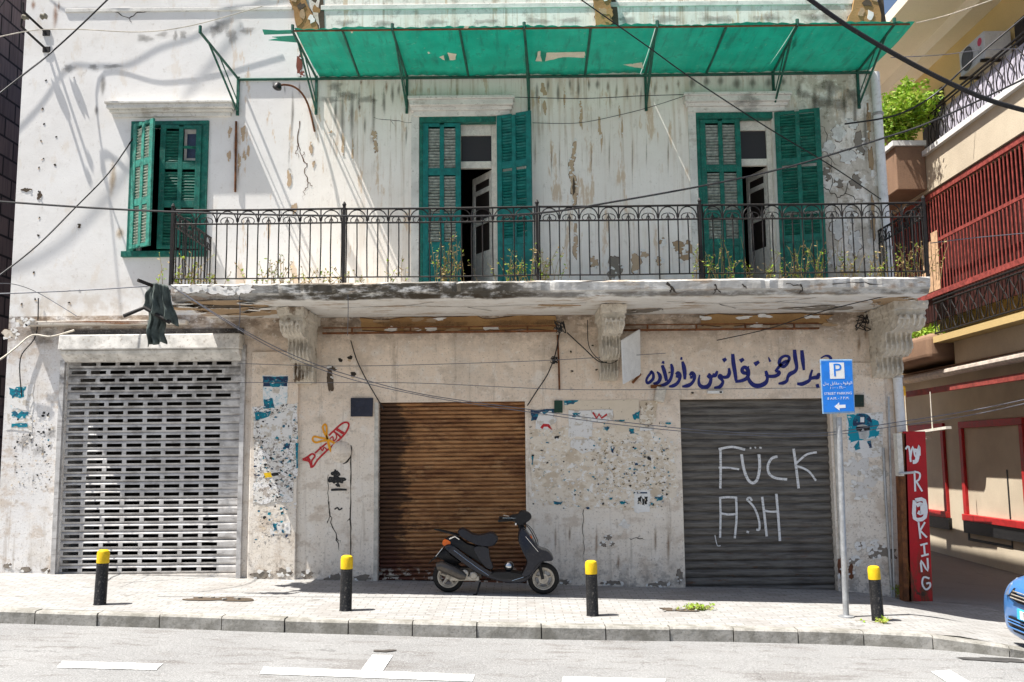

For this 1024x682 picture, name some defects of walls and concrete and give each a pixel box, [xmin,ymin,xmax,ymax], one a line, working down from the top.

crack [295,121,312,194]
spalling [563,91,583,205]
peeling [822,101,876,269]
peeling [590,237,693,280]
spalling [360,304,581,332]